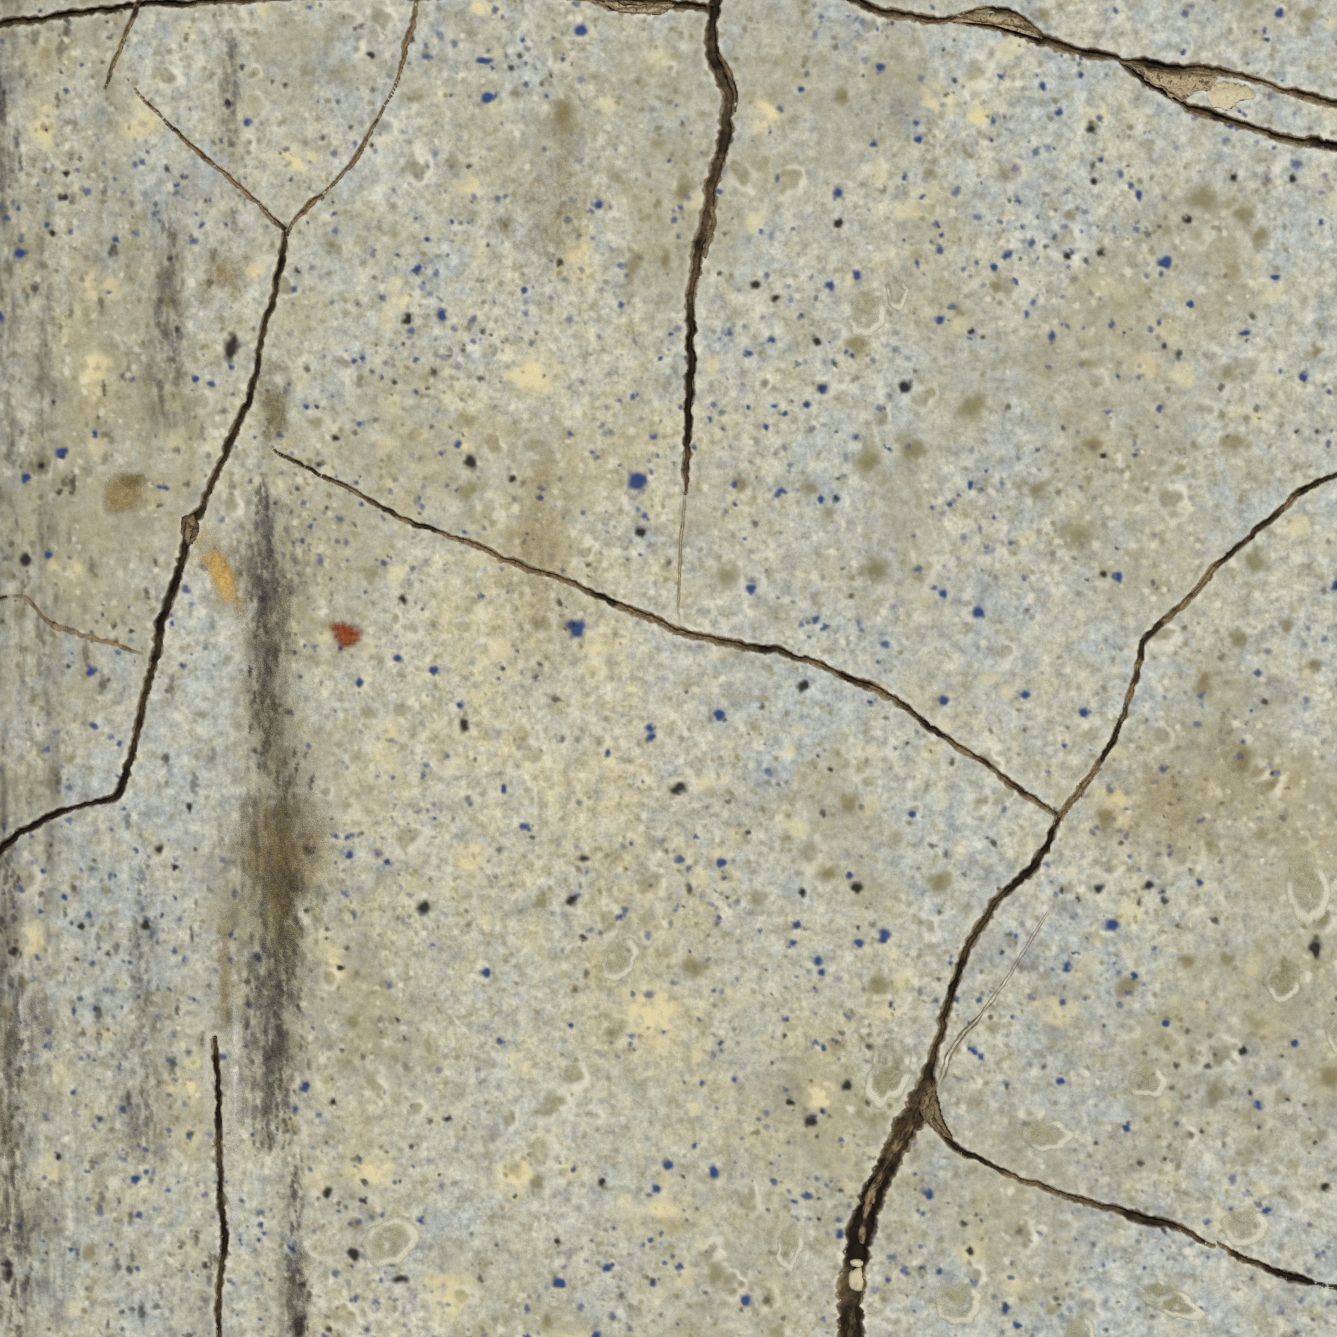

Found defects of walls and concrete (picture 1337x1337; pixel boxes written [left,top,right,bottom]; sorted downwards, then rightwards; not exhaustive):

spalling [1128,64,1255,110]
crack [0,0,418,857]
damp [248,545,291,703]
crack [270,0,1337,1337]
damp [252,809,303,1006]
damp [232,1025,287,1112]
crack [210,1038,229,1337]